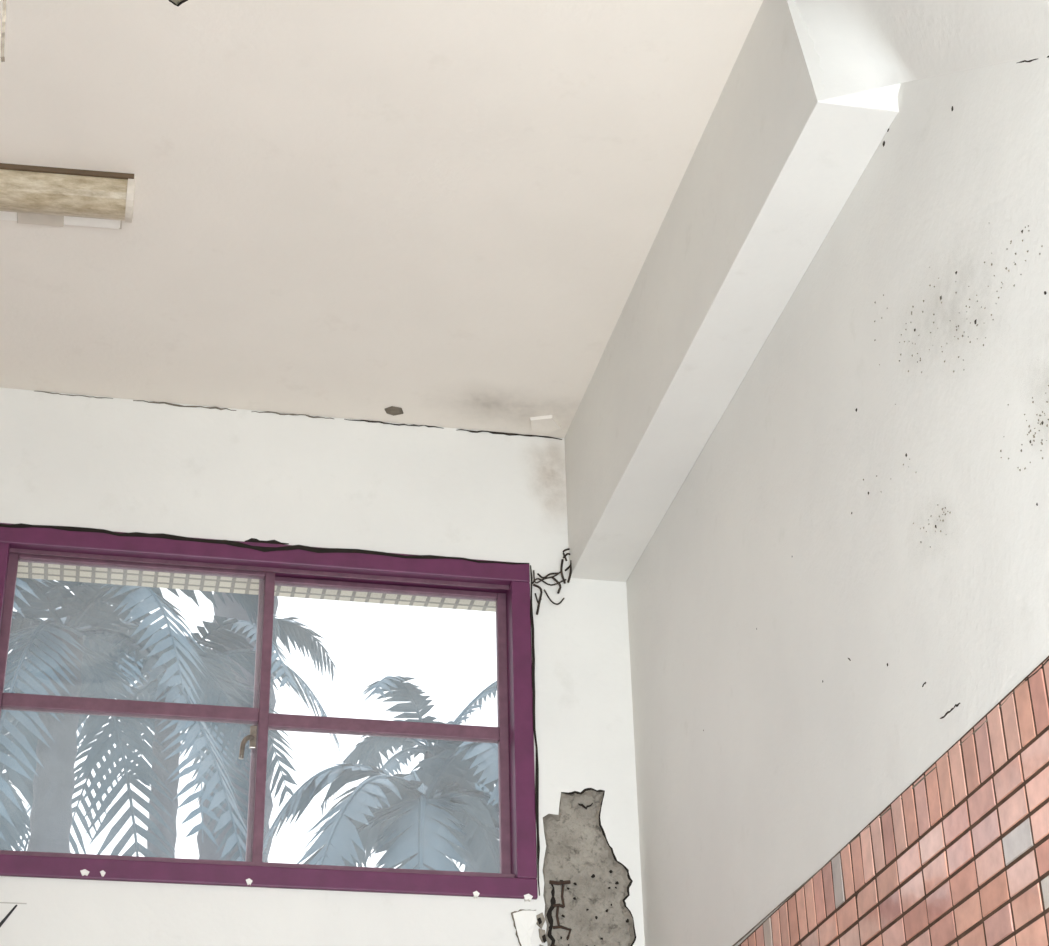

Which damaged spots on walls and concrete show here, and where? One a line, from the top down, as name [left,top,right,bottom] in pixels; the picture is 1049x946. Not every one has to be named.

water stain [899,225,1043,373]
water stain [1000,385,1049,471]
spalling [511,788,636,946]